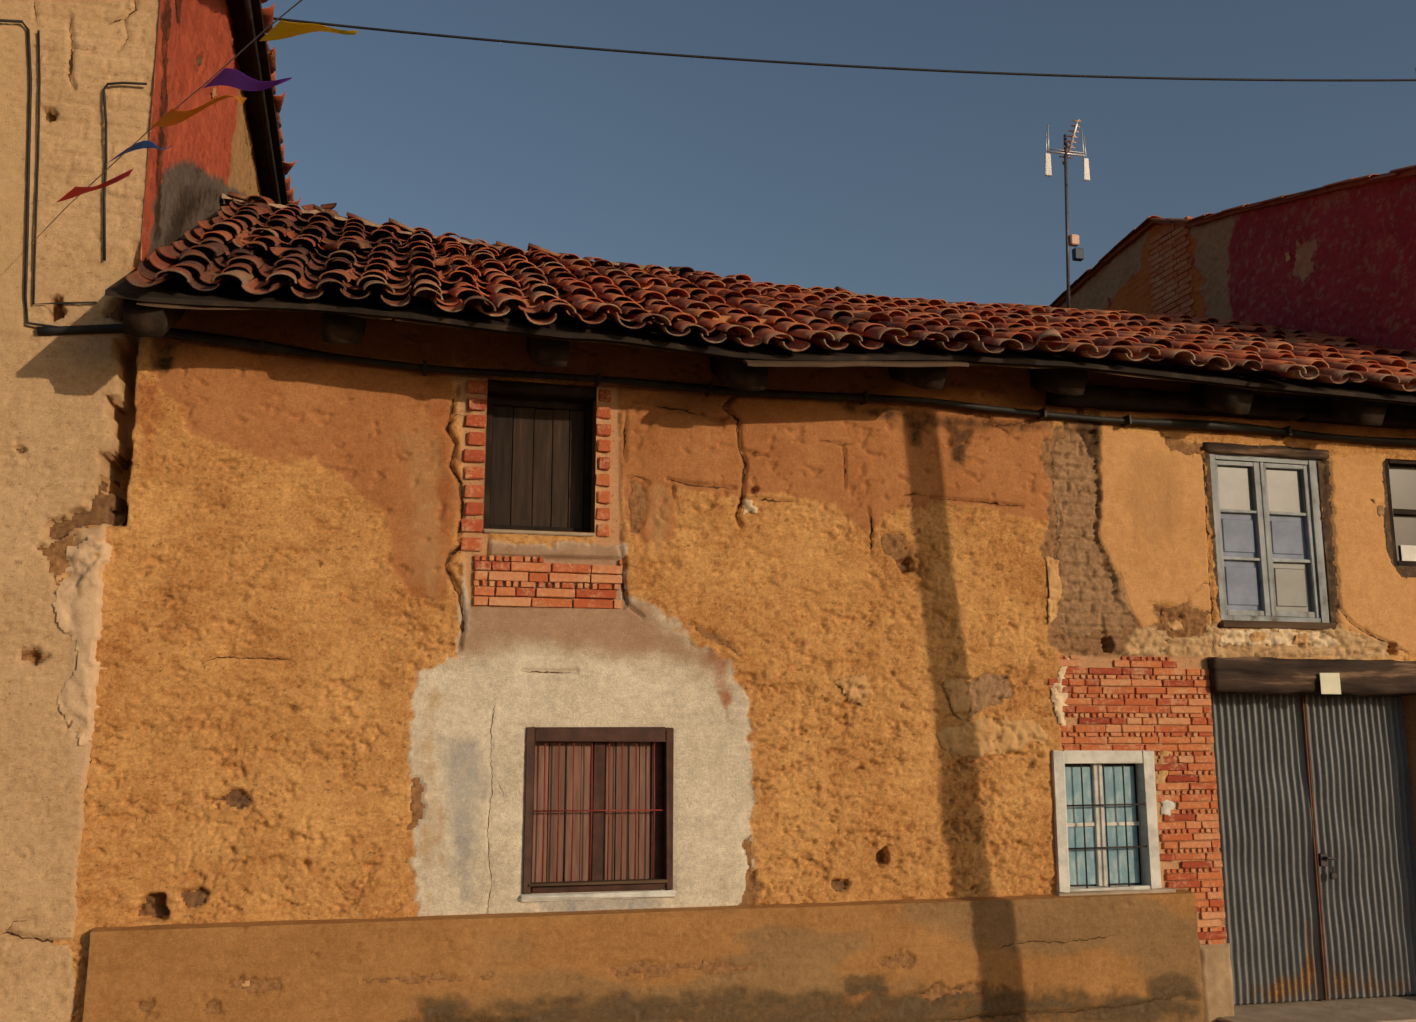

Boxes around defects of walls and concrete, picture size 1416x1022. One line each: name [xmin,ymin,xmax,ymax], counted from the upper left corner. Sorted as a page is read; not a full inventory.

crack [34,0,137,88]
spalling [1285,238,1318,283]
spalling [37,451,132,586]
crack [445,391,467,640]
crack [623,397,794,520]
crack [822,440,874,558]
crack [902,493,1020,506]
spalling [1045,432,1136,637]
spalling [1153,437,1340,648]
peeling [937,658,1069,762]
crack [487,707,501,912]
spalling [741,835,761,905]